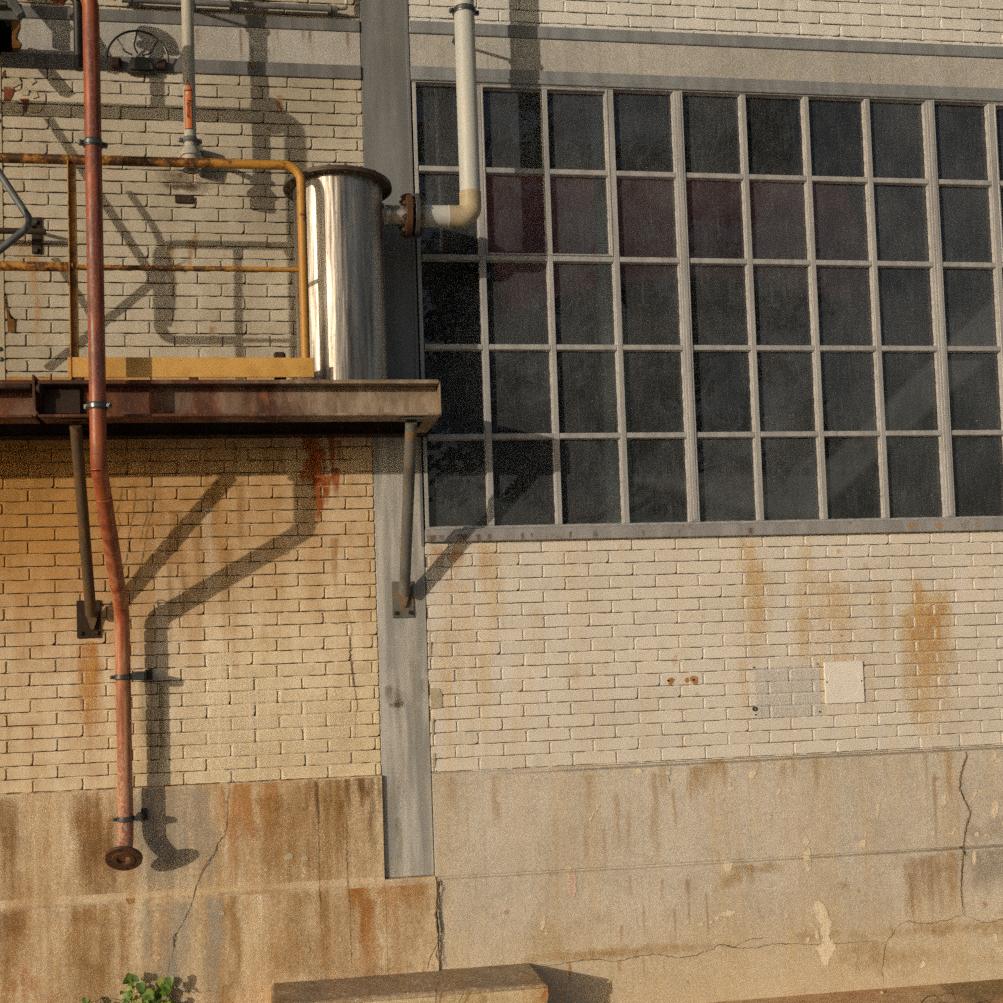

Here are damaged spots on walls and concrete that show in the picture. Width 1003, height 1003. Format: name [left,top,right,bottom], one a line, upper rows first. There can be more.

rust [300,438,340,517]
rust [337,778,372,815]
crack [916,749,1002,924]
crack [168,784,229,993]
rust [349,887,374,952]
crack [427,880,443,969]
spalling [806,901,836,965]